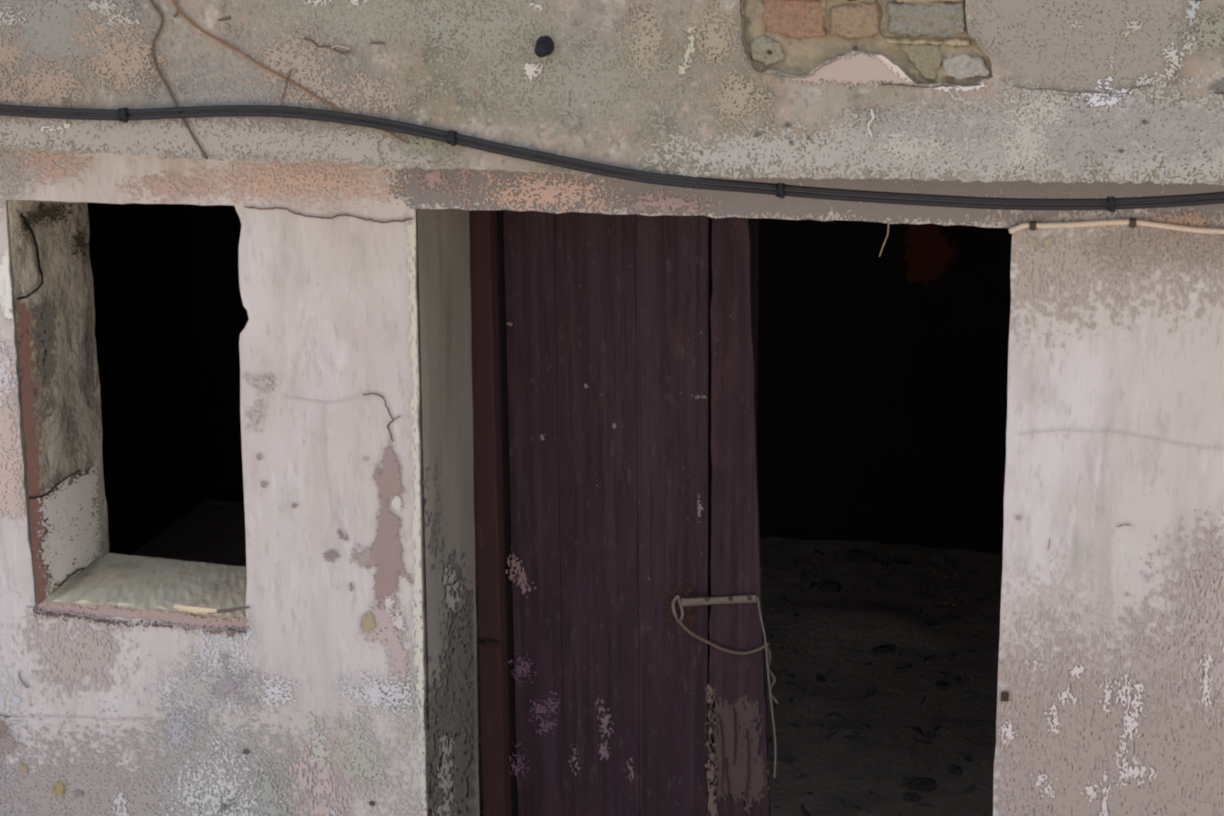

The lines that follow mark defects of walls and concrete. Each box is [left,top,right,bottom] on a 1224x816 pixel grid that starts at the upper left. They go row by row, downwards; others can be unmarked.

spalling [742,0,993,89]
crack [244,206,412,223]
water stain [0,459,477,816]
crack [284,318,401,538]
peeling [323,220,427,816]
peeling [993,496,1224,816]